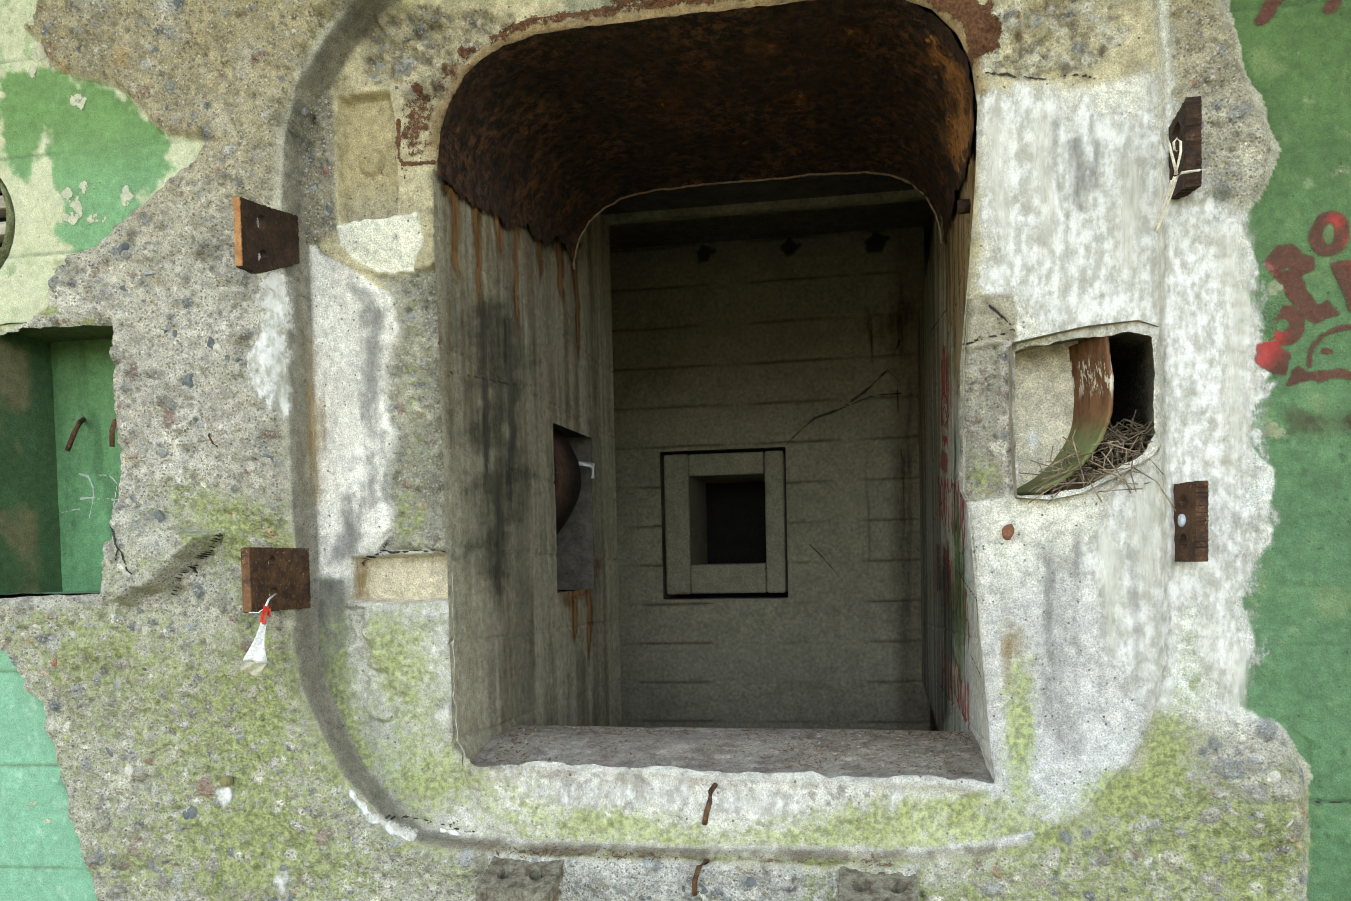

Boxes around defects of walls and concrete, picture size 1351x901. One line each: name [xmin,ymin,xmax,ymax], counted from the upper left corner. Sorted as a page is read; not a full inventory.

corrosion [395,0,721,179]
spalling [979,0,1129,82]
spalling [1163,0,1274,212]
damp [247,270,295,420]
spalling [0,0,840,901]
corrosion [441,181,581,356]
crack [785,340,901,446]
corrosion [925,0,1003,389]
peeling [1267,280,1284,296]
damp [216,787,232,808]
damp [274,871,288,899]
damp [349,790,420,842]